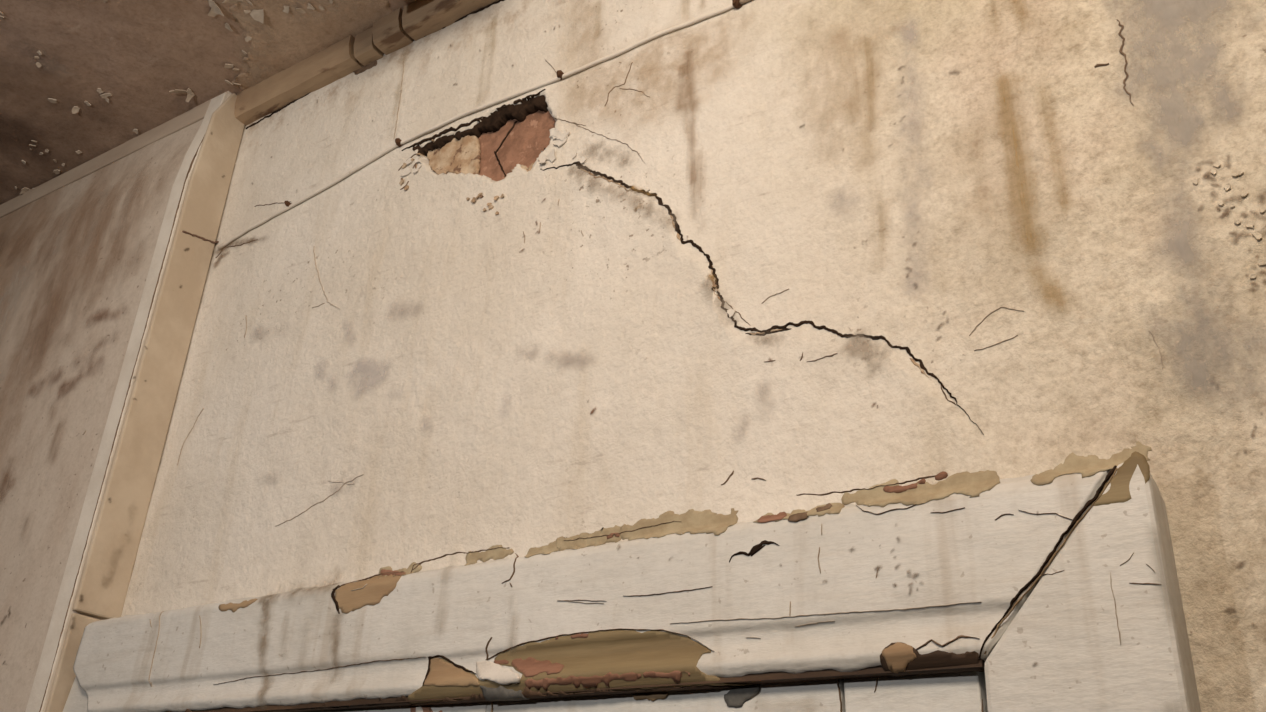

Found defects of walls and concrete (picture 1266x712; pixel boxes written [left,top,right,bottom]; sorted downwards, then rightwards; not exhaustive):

peeling [208,0,393,90]
peeling [72,88,112,114]
flaking render [398,89,570,215]
crack [543,62,984,435]
peeling [754,470,1000,523]
peeling [1031,441,1152,506]
peeling [291,508,738,614]
peeling [219,595,272,612]
peeling [408,628,761,712]
peeling [880,635,984,677]